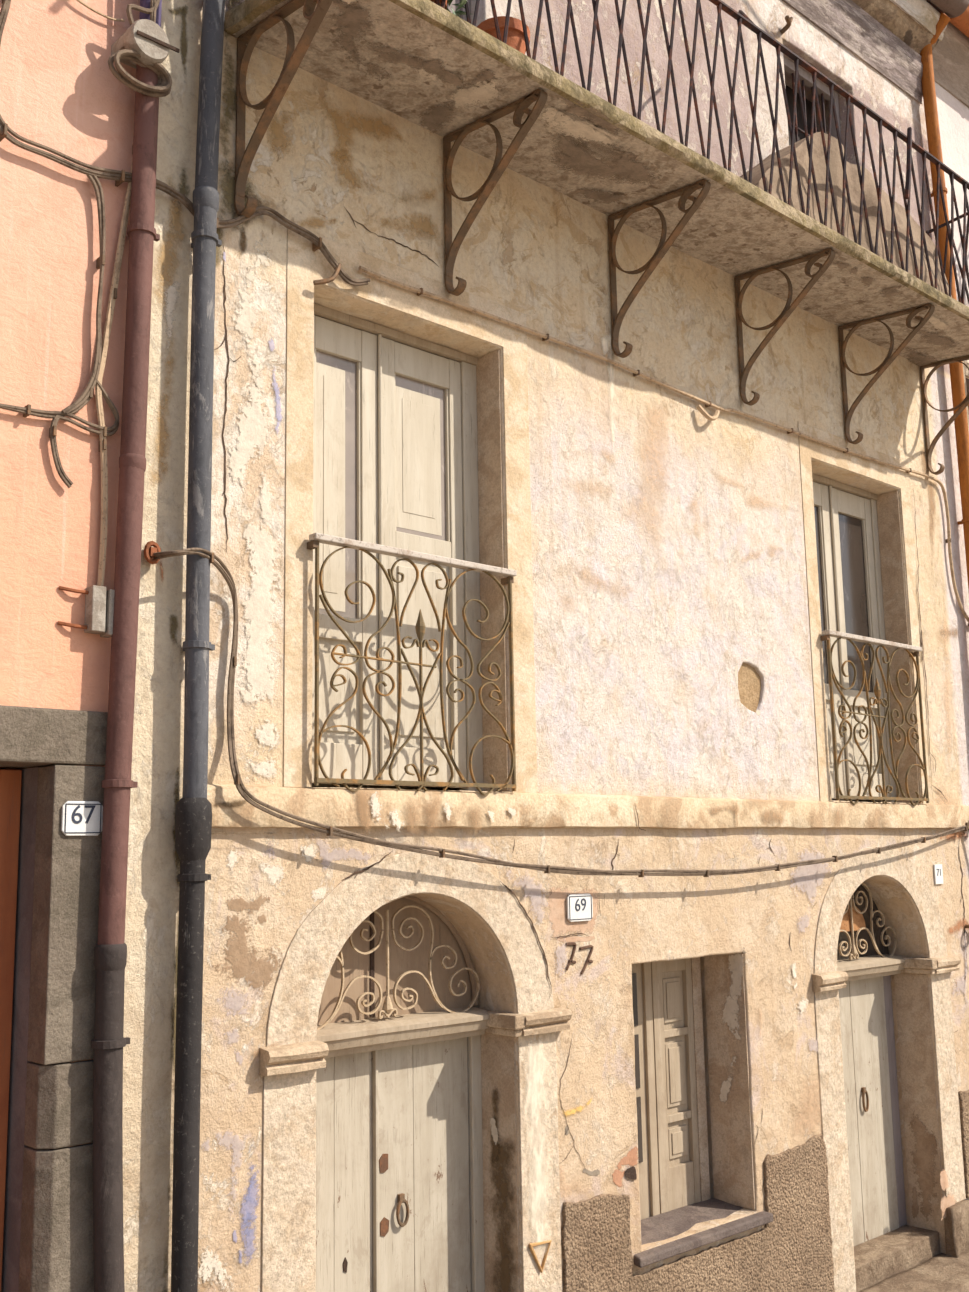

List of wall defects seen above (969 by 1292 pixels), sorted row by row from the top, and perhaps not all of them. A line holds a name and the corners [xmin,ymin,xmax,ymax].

crack [344,207,439,267]
crack [214,246,240,552]
flaking render [227,241,282,780]
spalling [212,841,285,997]
flaking render [297,838,371,868]
peeling [198,1132,260,1290]
damp [491,1090,514,1292]
damp [527,1043,546,1242]
crack [559,1039,585,1169]